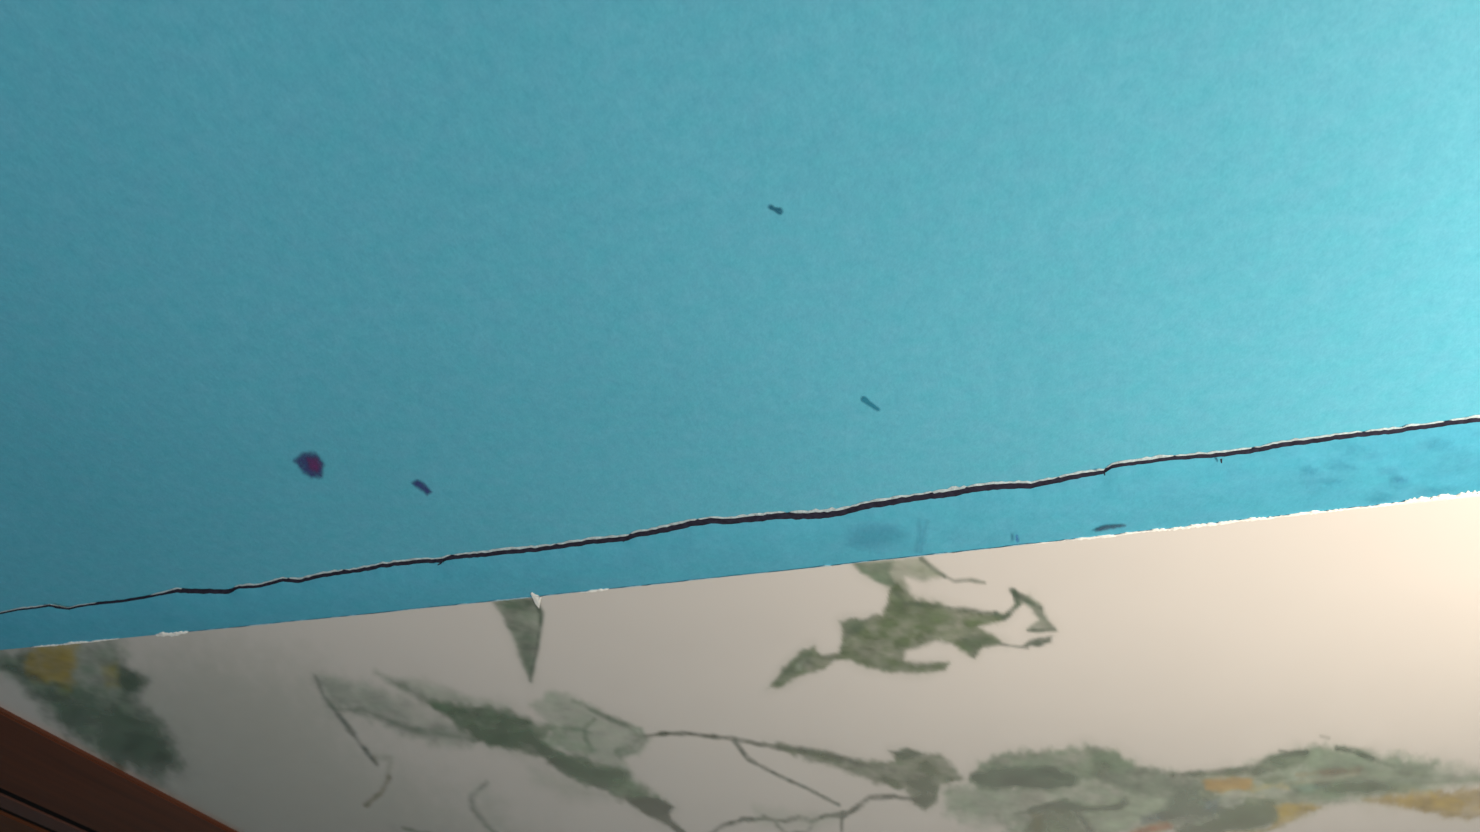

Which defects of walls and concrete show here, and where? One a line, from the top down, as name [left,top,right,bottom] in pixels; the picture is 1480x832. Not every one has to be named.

crack [0,415,1480,614]